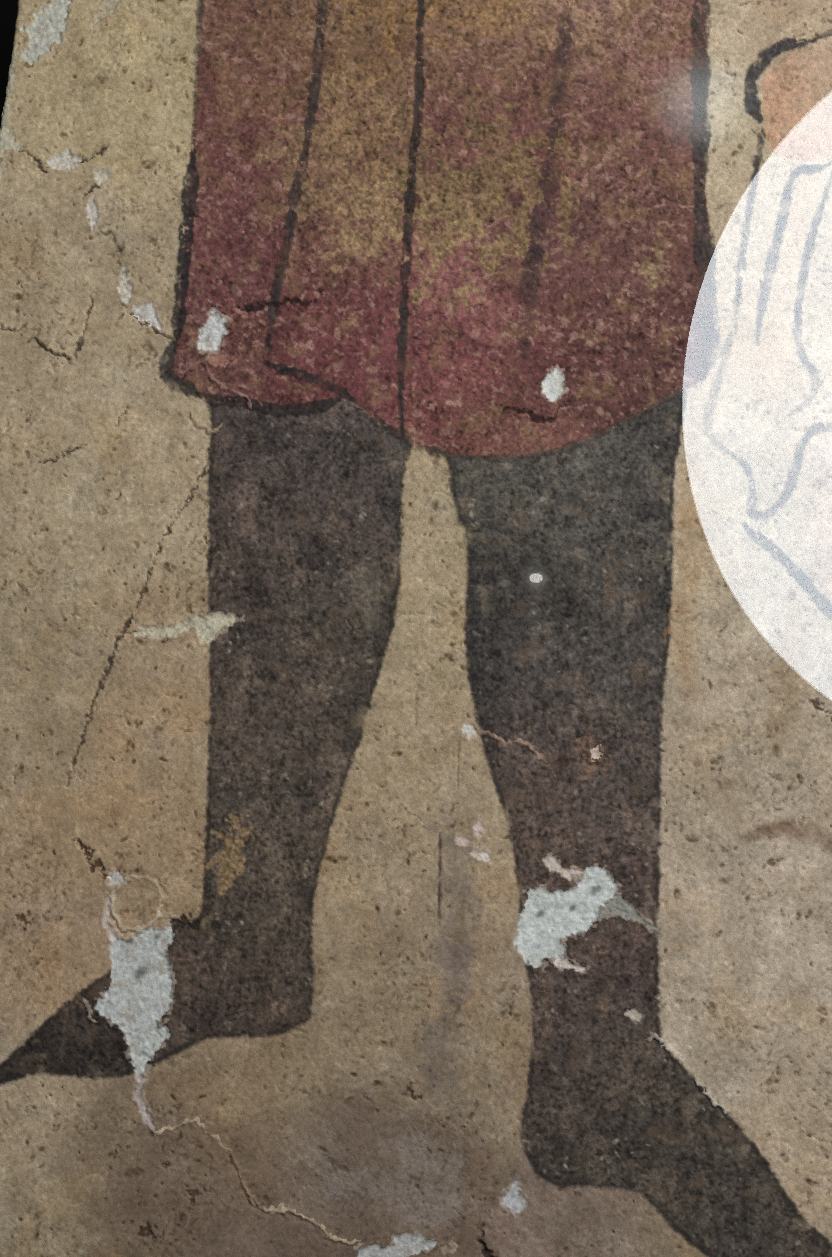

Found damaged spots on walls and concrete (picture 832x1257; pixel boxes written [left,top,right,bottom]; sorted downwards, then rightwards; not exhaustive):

spalling [0,0,115,234]
crack [97,227,252,410]
spalling [195,307,231,368]
spalling [540,364,570,404]
crack [65,412,223,788]
spalling [116,608,245,647]
spalling [70,838,200,1083]
spalling [510,852,659,975]
crack [130,1073,361,1245]
spalling [353,1230,458,1257]
spalling [498,1177,528,1215]